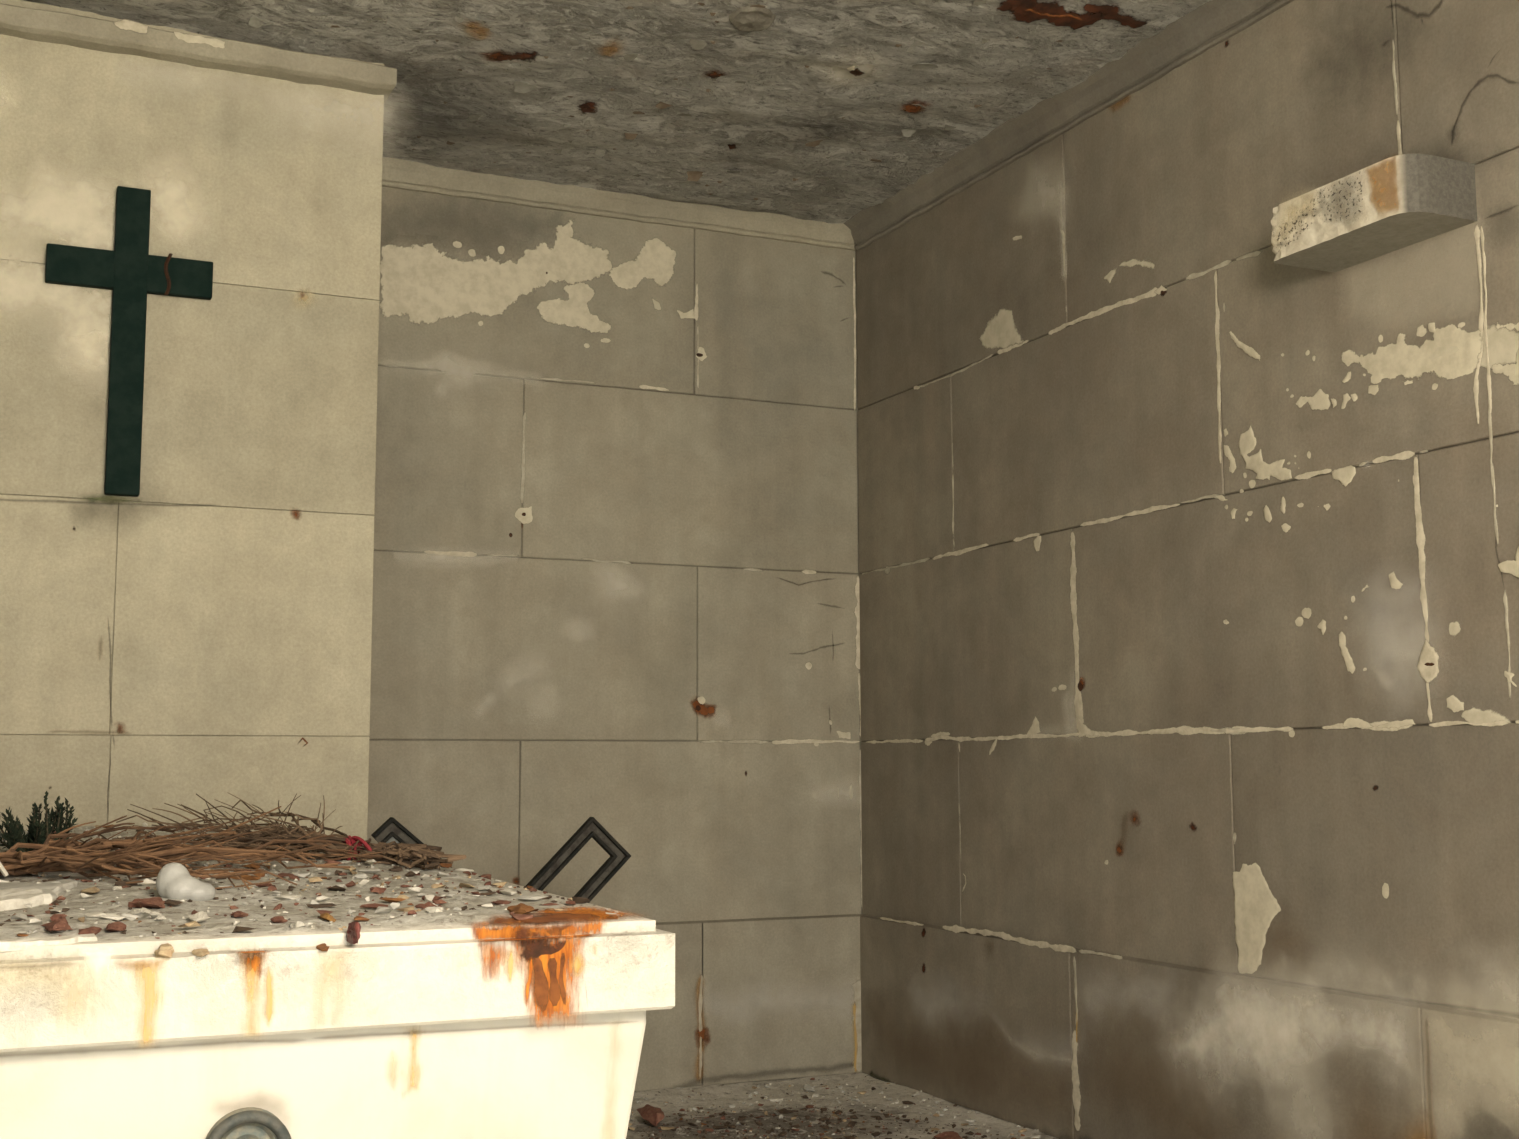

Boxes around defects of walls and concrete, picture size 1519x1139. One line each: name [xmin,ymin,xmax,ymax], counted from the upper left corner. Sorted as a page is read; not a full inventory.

corrosion [487,51,538,62]
corrosion [1369,160,1399,210]
flaking render [379,220,696,348]
flaking render [980,309,1023,349]
flaking render [1286,322,1519,410]
flaking render [1216,425,1331,533]
flaking render [1498,547,1519,578]
corrosion [691,696,715,717]
flaking render [1232,863,1281,974]
corrosion [142,965,157,1042]
corrosion [238,950,272,1020]
corrosion [473,907,638,1023]